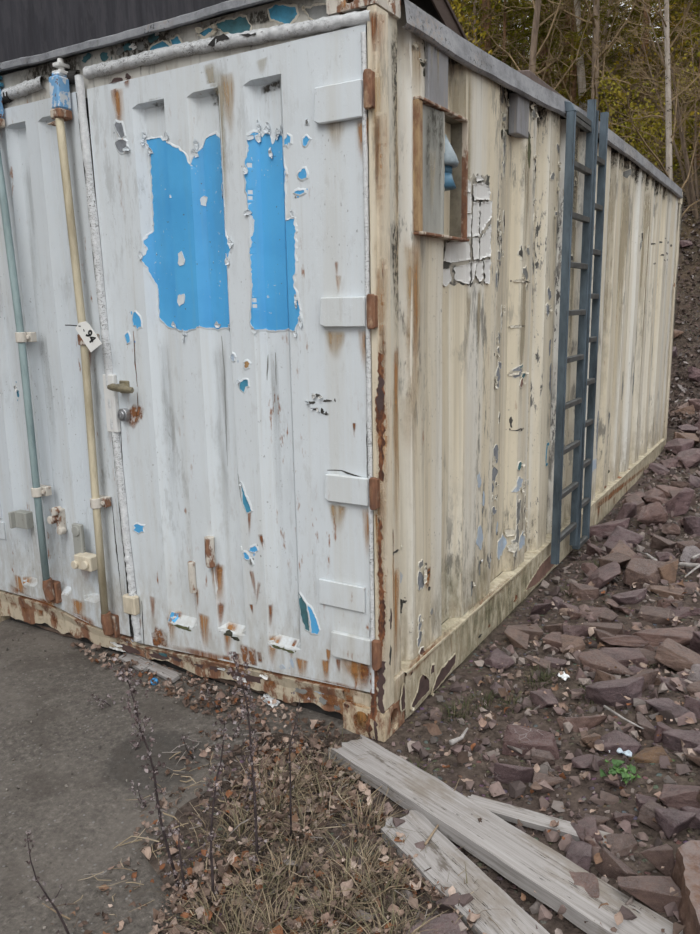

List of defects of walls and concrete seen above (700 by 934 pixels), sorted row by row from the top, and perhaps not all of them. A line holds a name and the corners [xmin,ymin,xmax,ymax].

peeling [267,2,329,24]
peeling [113,119,130,155]
rust [358,75,386,182]
peeling [138,131,233,342]
peeling [243,118,312,337]
rust [375,260,398,487]
rust [212,565,223,591]
rust [153,628,166,649]
rust [191,646,275,687]
peeling [298,589,321,636]
rust [297,499,399,741]
peeling [400,653,456,712]